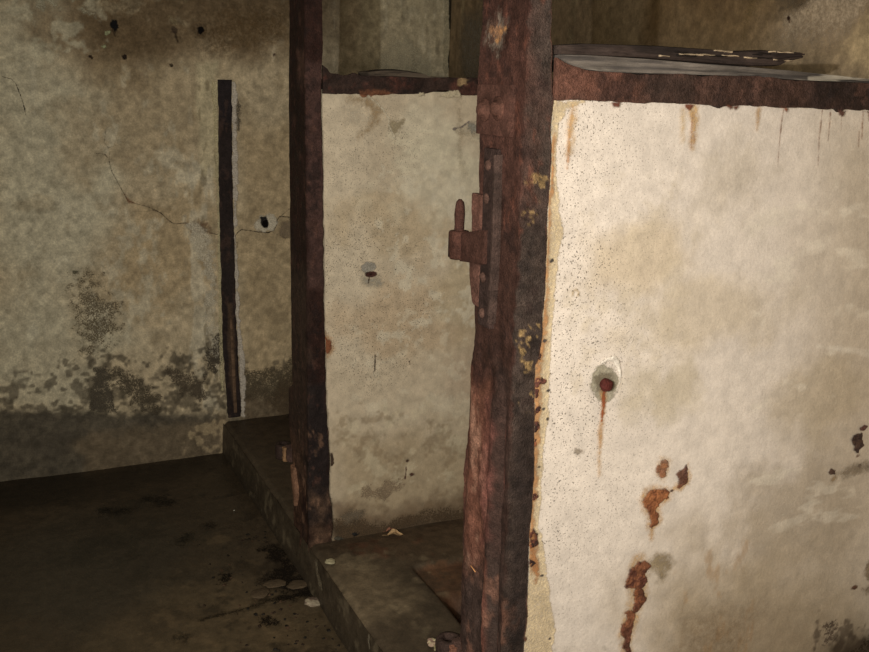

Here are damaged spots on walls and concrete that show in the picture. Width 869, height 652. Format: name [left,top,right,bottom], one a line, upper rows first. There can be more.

rust [682,104,698,143]
spalling [254,214,290,238]
water stain [67,267,125,355]
water stain [90,366,162,415]
water stain [165,330,223,402]
water stain [239,359,293,414]